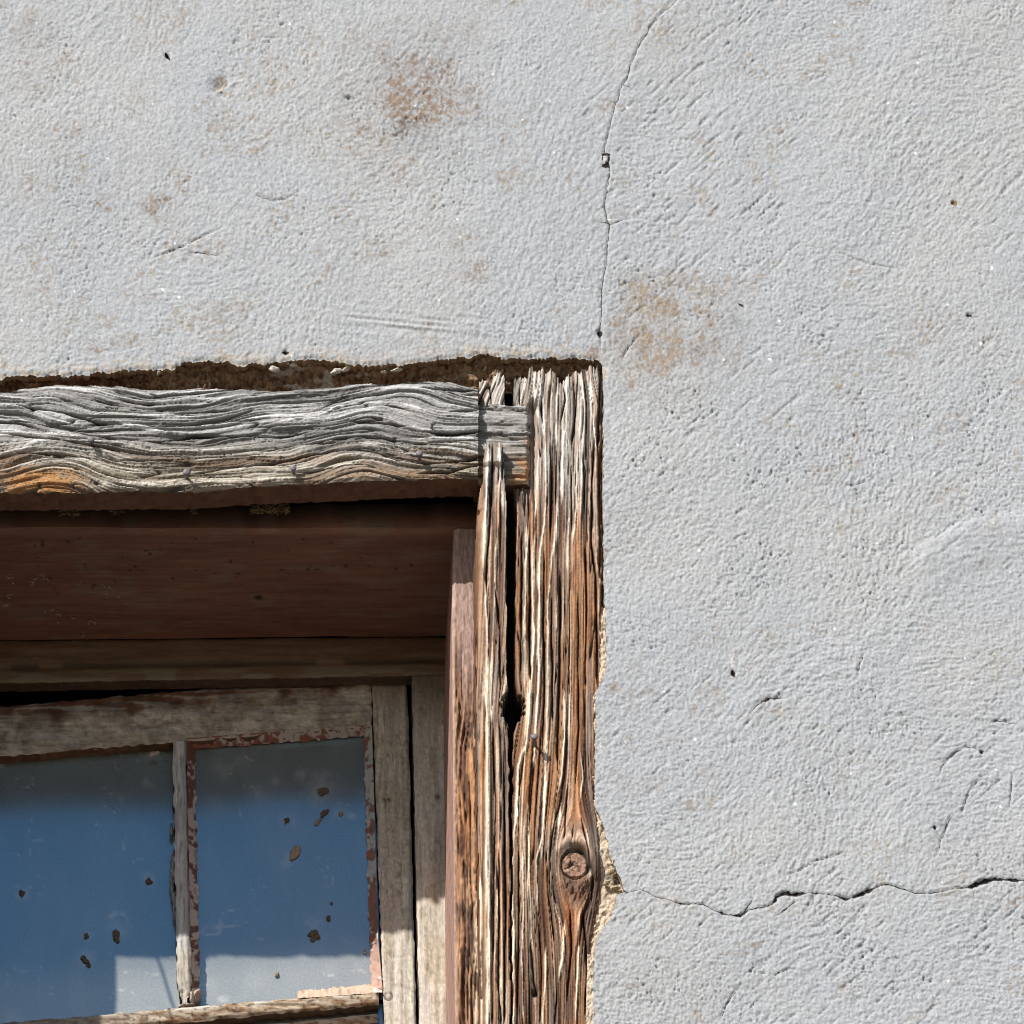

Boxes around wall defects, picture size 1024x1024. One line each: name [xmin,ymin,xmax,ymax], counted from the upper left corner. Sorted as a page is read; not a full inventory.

crack [592,1,676,357]
flaking render [0,352,603,395]
flaking render [593,597,607,754]
flaking render [586,776,623,1024]
crack [623,854,1024,917]